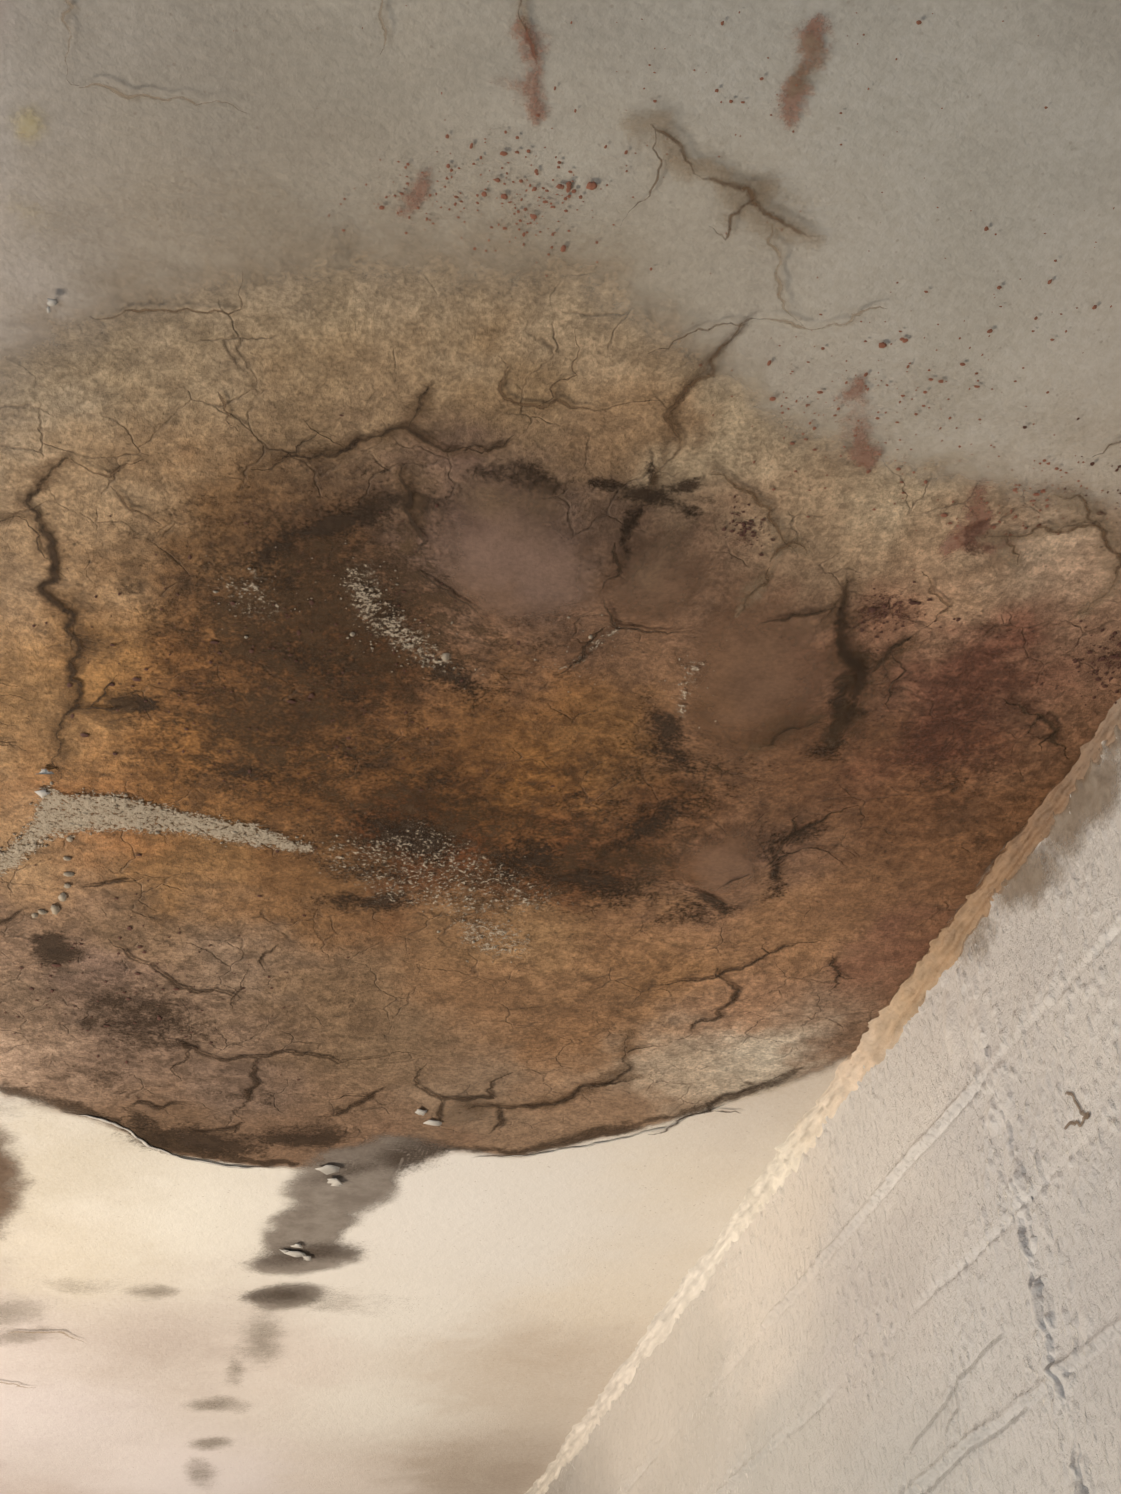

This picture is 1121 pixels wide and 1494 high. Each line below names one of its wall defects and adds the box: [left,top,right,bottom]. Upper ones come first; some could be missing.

rust [770,15,828,133]
crack [254,125,885,556]
crack [1,457,159,766]
crack [560,543,692,674]
crack [715,474,950,749]
crack [984,494,1121,614]
damp [0,257,1121,1309]
crack [1002,698,1066,757]
crack [0,911,19,924]
crack [83,878,141,888]
crack [684,811,842,914]
crack [111,940,855,1135]